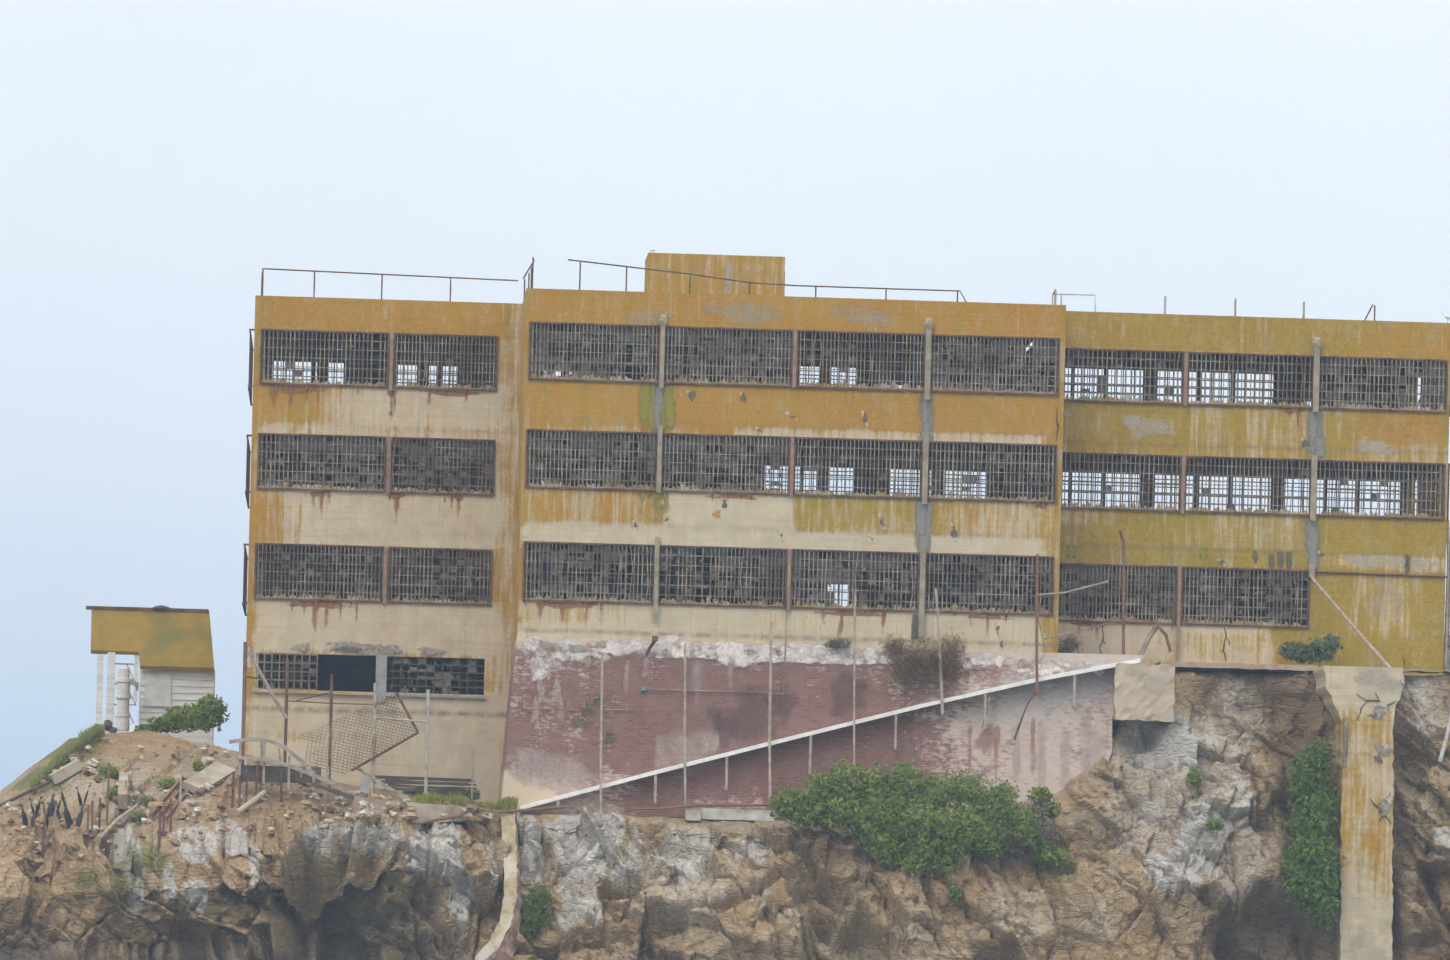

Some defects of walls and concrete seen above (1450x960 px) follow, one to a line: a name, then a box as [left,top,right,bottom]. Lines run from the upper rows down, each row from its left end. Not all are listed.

water stain [639,379,675,432]
water stain [1307,409,1326,458]
corrosion [309,491,331,508]
corrosion [389,493,405,511]
water stain [915,500,933,553]
corrosion [291,601,358,628]
peeling [524,623,1114,681]